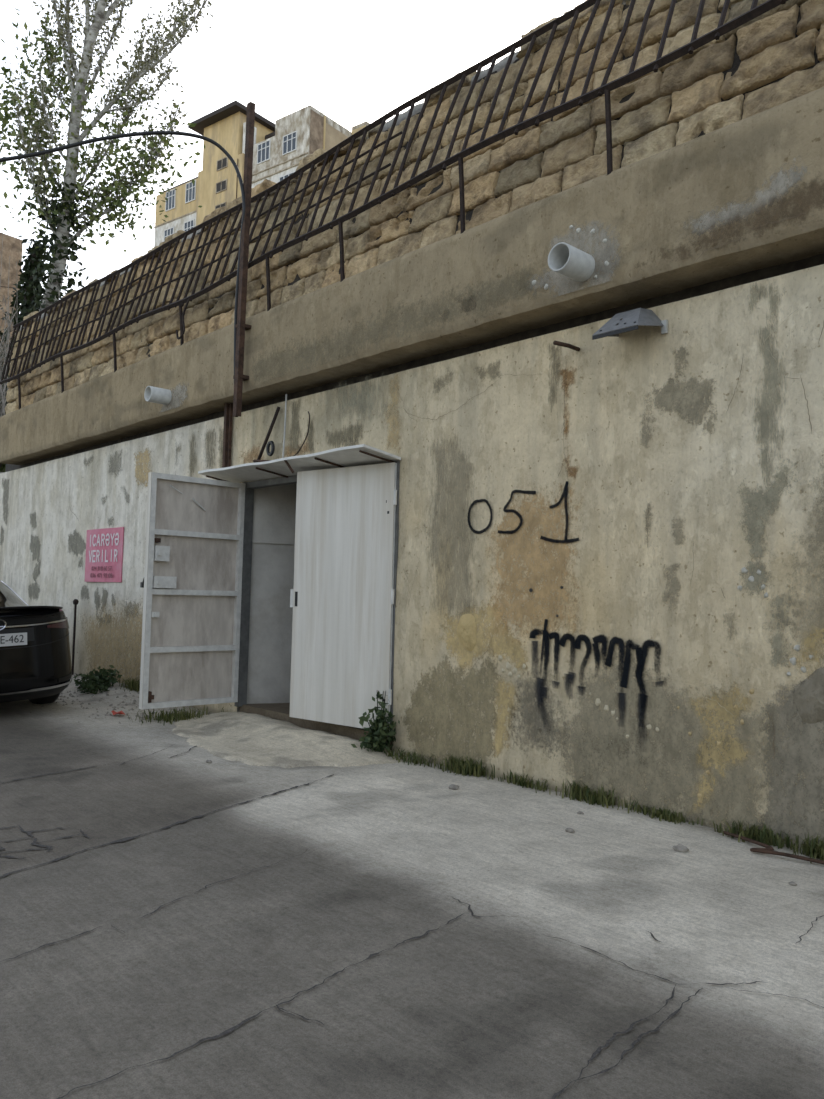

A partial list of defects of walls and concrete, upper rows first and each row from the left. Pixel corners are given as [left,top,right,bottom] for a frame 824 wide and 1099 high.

crack [0,850,307,962]
crack [0,774,334,878]
crack [57,895,516,1099]
crack [549,936,824,1099]